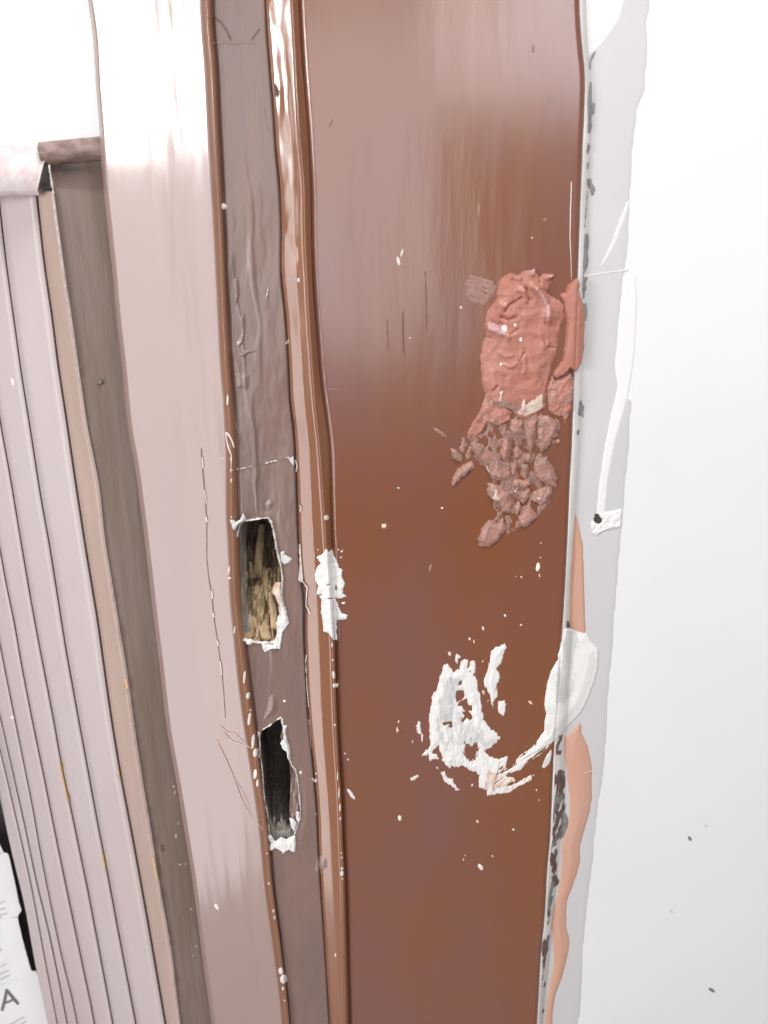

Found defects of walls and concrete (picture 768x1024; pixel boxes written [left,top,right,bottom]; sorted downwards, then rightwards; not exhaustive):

peeling [315,549,348,640]
peeling [566,514,586,633]
peeling [482,643,507,716]
peeling [289,811,301,831]
peeling [436,767,473,791]
peeling [542,723,594,1024]